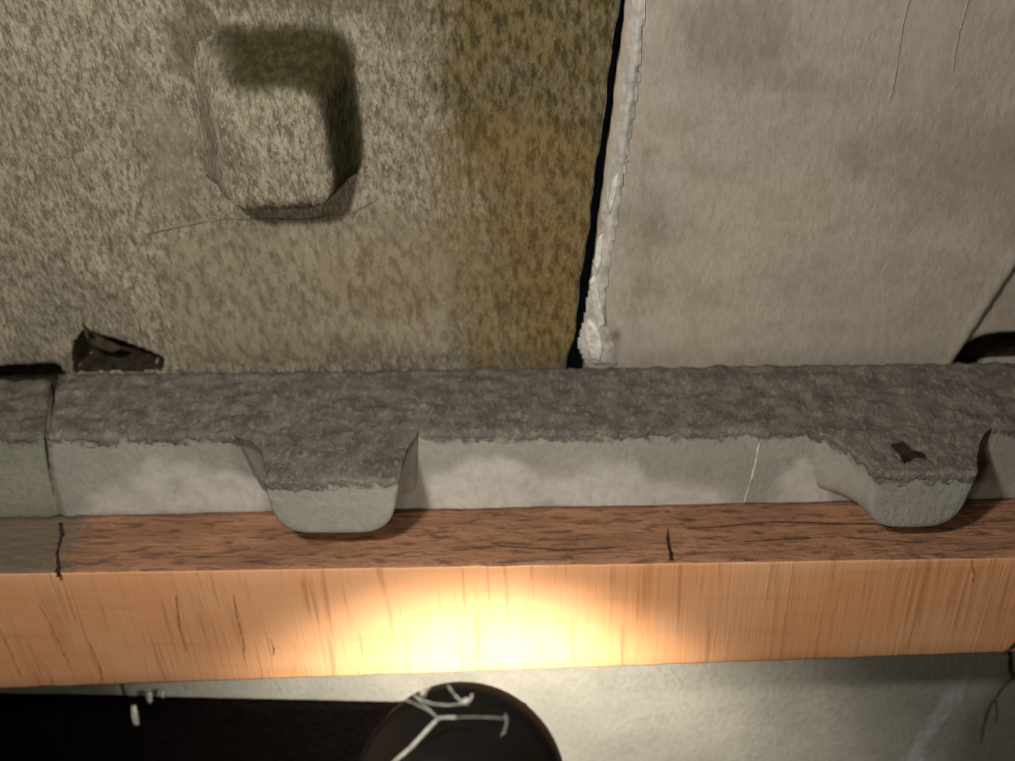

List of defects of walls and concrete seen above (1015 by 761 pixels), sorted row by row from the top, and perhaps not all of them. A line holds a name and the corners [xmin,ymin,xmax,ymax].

leakage [431,0,619,353]
spalling [0,321,165,392]
spalling [891,441,925,463]
crack [55,522,65,578]
crack [980,642,1015,743]